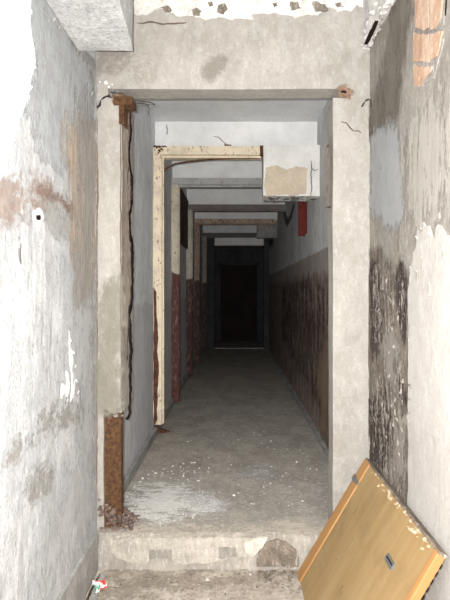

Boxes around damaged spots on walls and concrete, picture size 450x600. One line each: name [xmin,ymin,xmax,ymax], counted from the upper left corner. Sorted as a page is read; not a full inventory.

peeling [133,0,363,20]
spalling [413,0,445,90]
corrosion [336,84,354,100]
spalling [264,165,317,202]
crack [120,112,134,420]
peeling [61,294,96,486]
leakage [316,326,329,450]